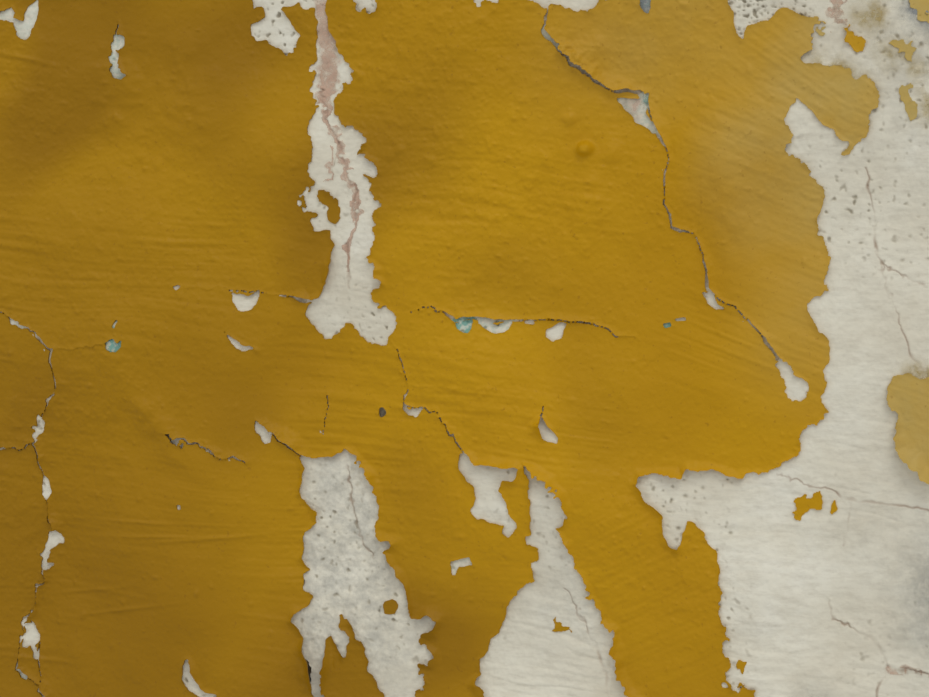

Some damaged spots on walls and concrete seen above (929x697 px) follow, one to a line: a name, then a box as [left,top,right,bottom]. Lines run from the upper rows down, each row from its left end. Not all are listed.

crack [0,307,104,697]
crack [162,430,251,467]
crack [181,285,309,307]
peeling [229,285,264,315]
peeling [247,0,401,350]
crack [316,89,361,290]
peeling [276,437,455,697]
peeling [450,313,573,346]
peeling [453,447,653,697]
crack [540,9,787,362]
peeling [624,0,929,697]
crack [827,598,929,697]